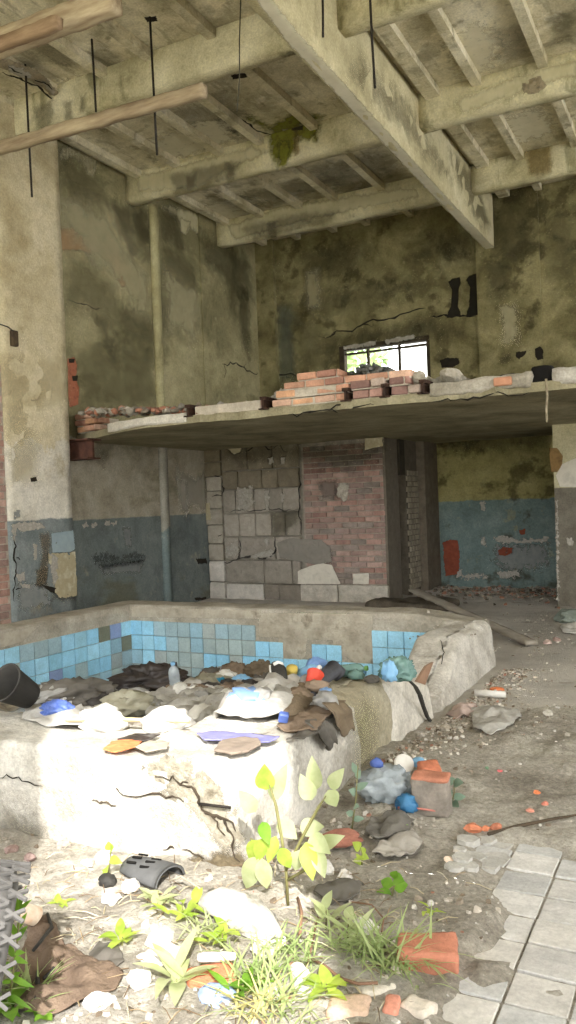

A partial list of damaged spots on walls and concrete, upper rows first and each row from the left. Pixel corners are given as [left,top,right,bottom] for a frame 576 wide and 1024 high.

damp [277,132,299,169]
crack [319,308,474,338]
spalling [531,365,554,383]
flaking render [364,437,383,450]
flaking render [0,366,117,648]
flaking render [298,563,340,584]
flaking render [353,573,369,584]
flaking render [442,539,520,581]
peeling [481,500,560,601]
crack [91,775,240,862]